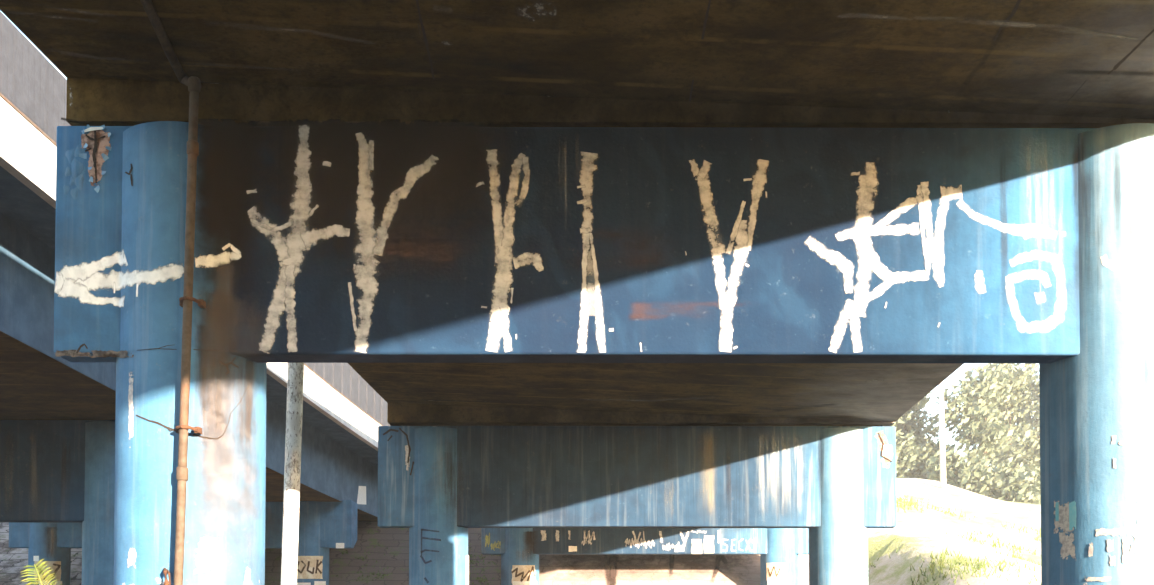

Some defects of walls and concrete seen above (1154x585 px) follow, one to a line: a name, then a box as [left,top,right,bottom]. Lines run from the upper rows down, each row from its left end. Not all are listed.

crack [1108,29,1154,74]
spalling [79,125,111,193]
peeling [127,548,137,569]
peeling [1085,527,1130,582]